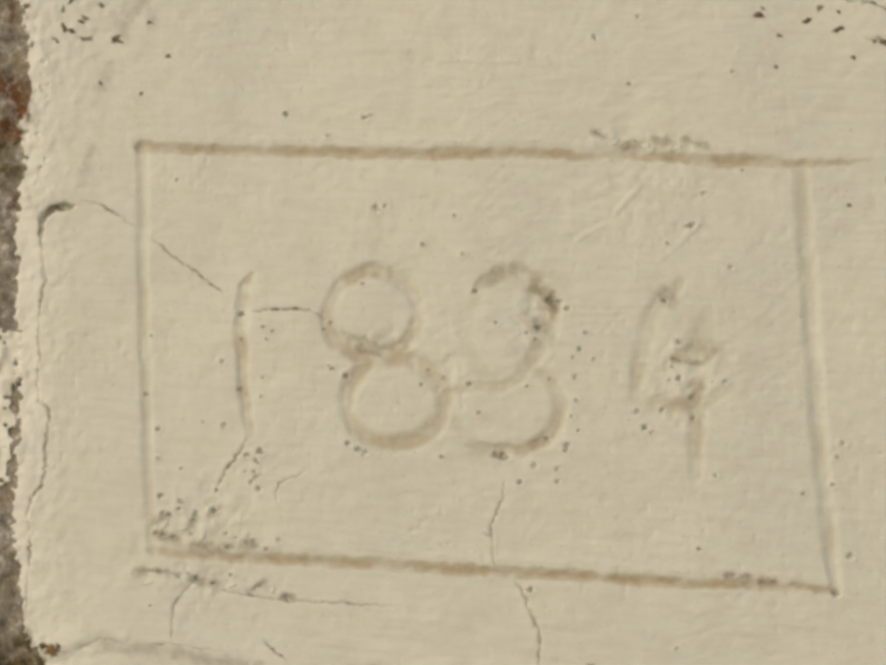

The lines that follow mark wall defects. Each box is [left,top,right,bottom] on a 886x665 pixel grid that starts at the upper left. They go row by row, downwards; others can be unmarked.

crack [41,205,69,233]